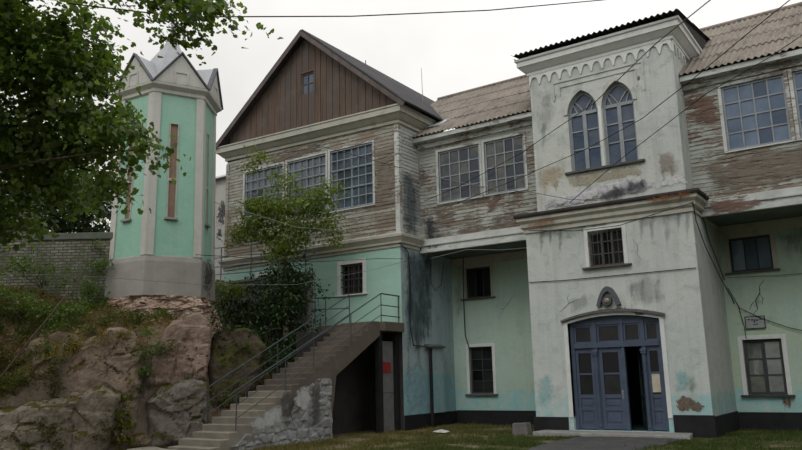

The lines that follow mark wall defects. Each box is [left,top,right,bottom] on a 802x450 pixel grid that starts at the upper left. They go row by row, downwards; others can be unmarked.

peeling [685,94,720,128]
peeling [374,146,395,205]
damp [602,180,645,199]
spalling [216,200,225,238]
peeling [434,196,519,235]
peeling [250,386,320,430]
spalling [676,396,704,412]